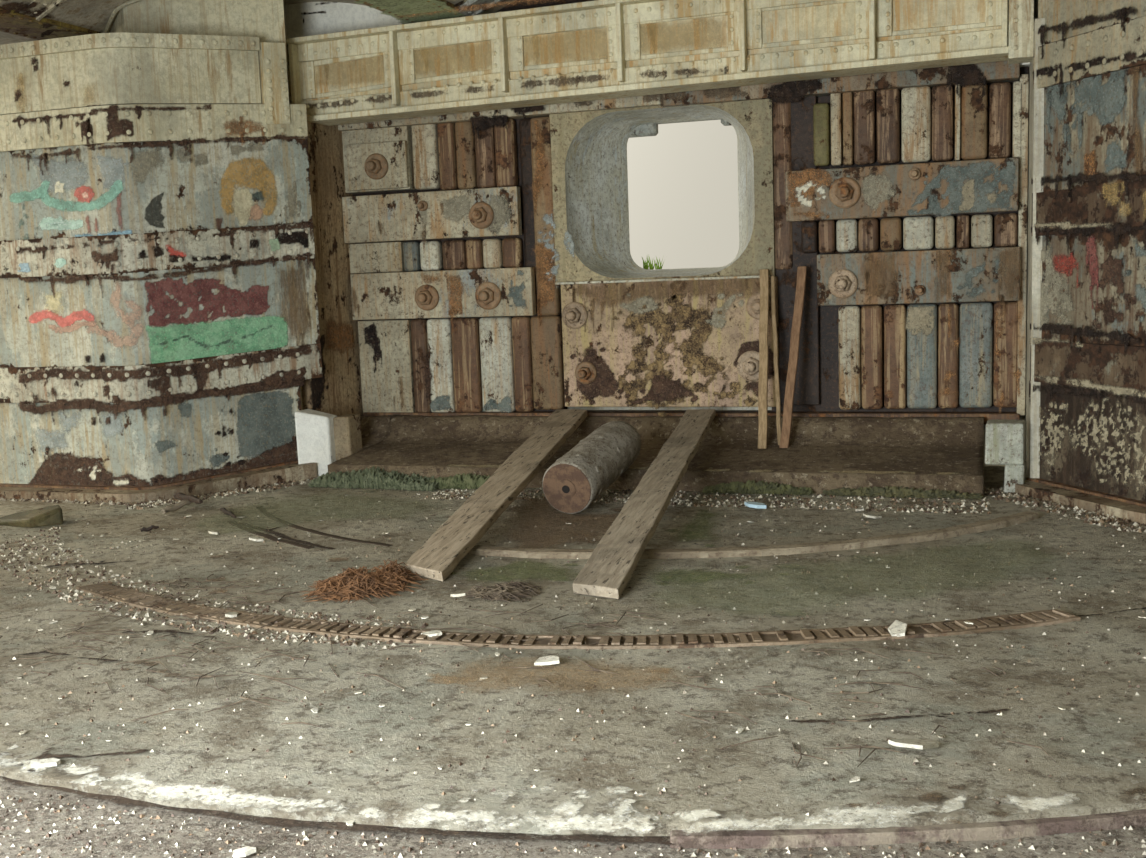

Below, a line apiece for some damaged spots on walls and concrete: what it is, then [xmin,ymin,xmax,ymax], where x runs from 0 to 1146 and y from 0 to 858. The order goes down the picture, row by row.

corrosion [11,105,309,175]
peeling [1046,69,1126,152]
corrosion [1031,6,1146,203]
peeling [796,181,826,207]
peeling [908,160,1016,221]
corrosion [15,222,313,298]
corrosion [1017,222,1146,356]
corrosion [18,335,329,437]
corrosion [364,323,382,373]
corrosion [734,339,774,396]
corrosion [29,436,298,487]
peeling [1034,376,1146,491]